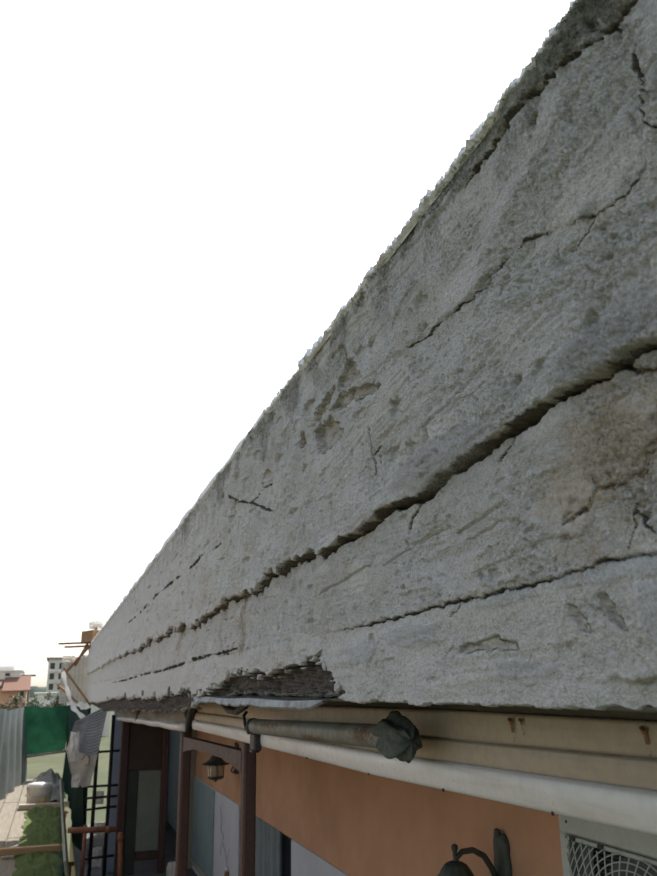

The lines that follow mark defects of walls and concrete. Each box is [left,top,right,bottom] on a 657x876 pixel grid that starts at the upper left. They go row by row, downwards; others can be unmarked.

crack [112,345,657,683]
spalling [90,654,346,713]